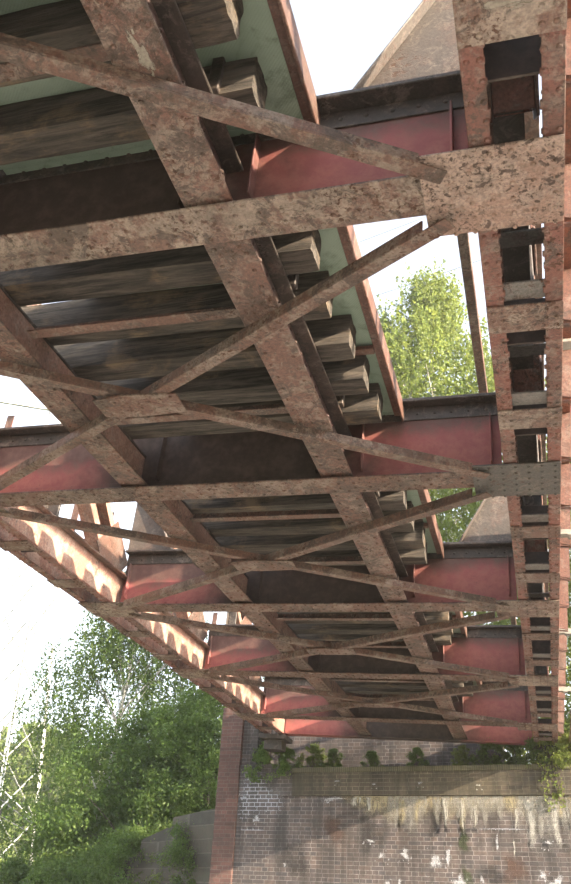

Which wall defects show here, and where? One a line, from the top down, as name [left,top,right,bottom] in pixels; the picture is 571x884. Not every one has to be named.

leakage [324,796,571,851]
leakage [431,845,466,884]